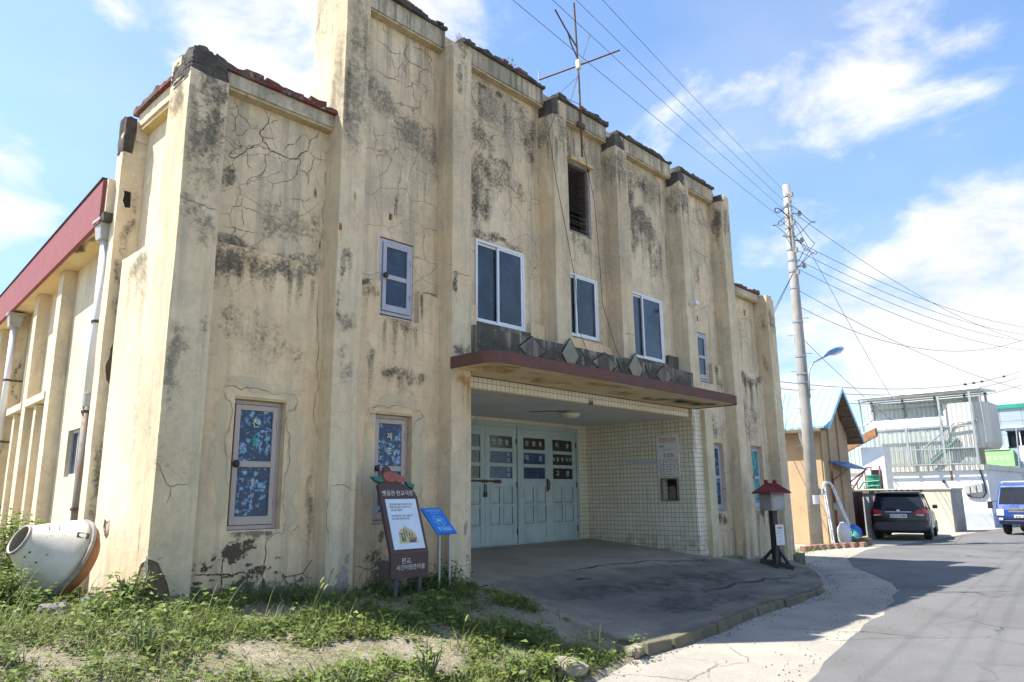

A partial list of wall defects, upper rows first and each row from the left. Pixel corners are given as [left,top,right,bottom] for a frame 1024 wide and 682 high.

crack [376,27,432,89]
leakage [191,71,228,155]
leakage [197,168,235,185]
leakage [204,217,319,291]
leakage [471,92,522,250]
leakage [603,151,688,276]
crack [181,97,326,592]
peeling [190,539,303,601]